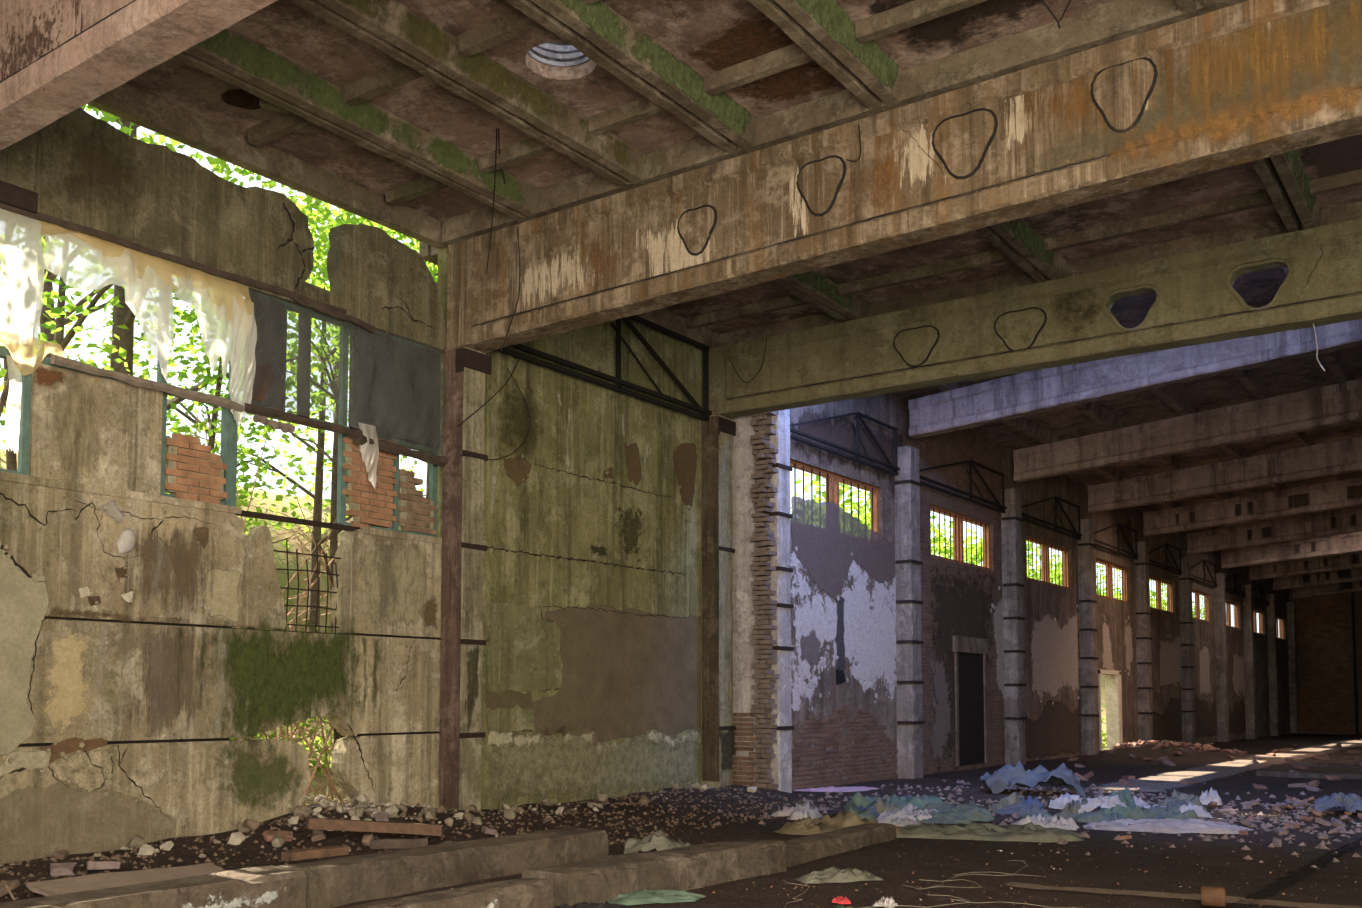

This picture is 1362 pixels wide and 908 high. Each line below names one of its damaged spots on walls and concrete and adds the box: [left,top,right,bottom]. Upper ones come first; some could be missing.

peeling [0,0,83,81]
spalling [221,89,289,114]
leakage [490,390,535,513]
crack [0,492,217,563]
mould [590,502,643,562]
spalling [733,410,903,791]
leakage [465,646,479,731]
crack [0,745,163,814]
crack [347,723,375,792]
leakage [487,730,701,803]
leakage [718,730,736,772]